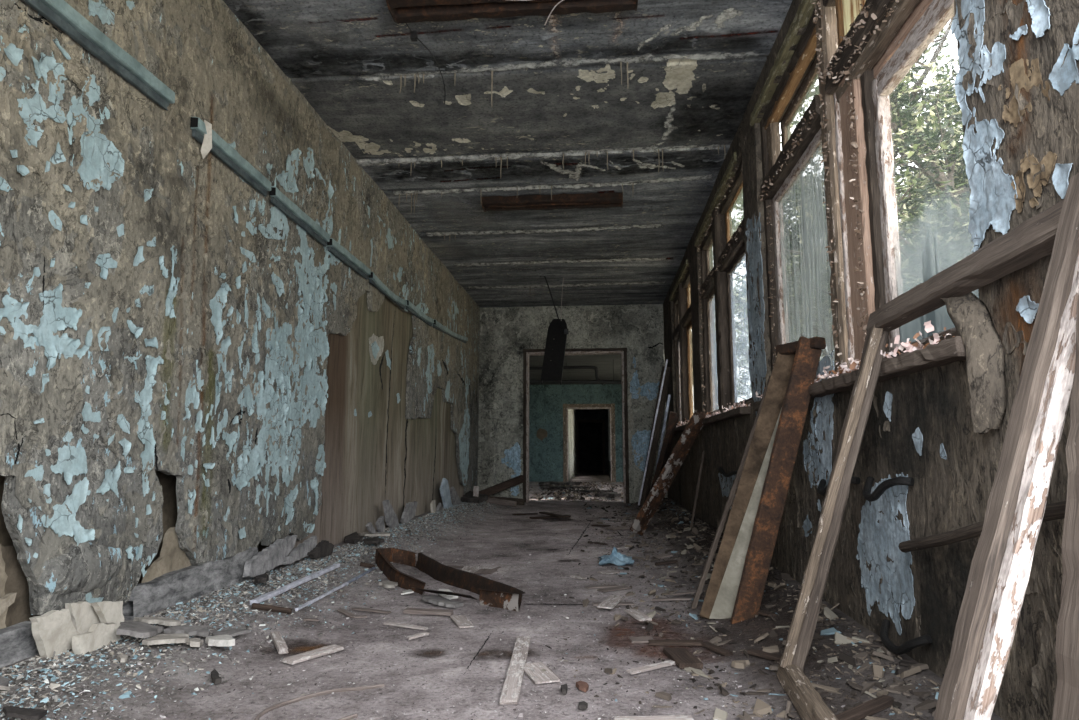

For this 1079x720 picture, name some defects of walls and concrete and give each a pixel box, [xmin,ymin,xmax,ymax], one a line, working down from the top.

peeling [950,0,1079,252]
peeling [0,0,899,603]
peeling [912,427,923,456]
peeling [880,292,1039,434]
peeling [1061,398,1071,440]
peeling [823,472,923,649]
peeling [1025,546,1062,720]